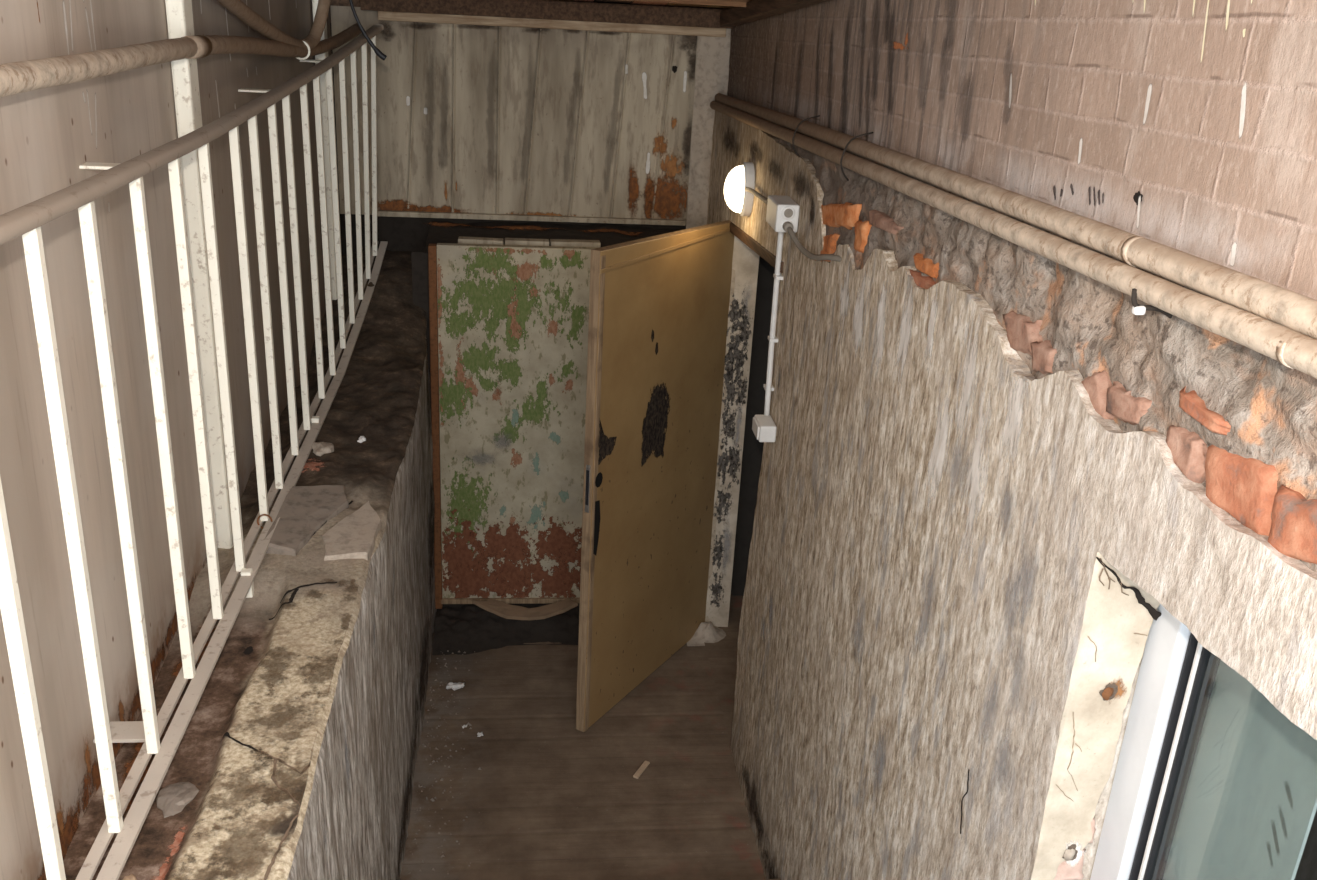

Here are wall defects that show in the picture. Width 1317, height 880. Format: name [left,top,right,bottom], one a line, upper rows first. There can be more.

damp [625,64,647,99]
damp [815,0,893,140]
damp [1143,84,1152,124]
rust [377,182,576,231]
rust [583,118,688,236]
peeling [437,246,588,475]
spalling [765,120,1317,572]
crack [269,582,337,620]